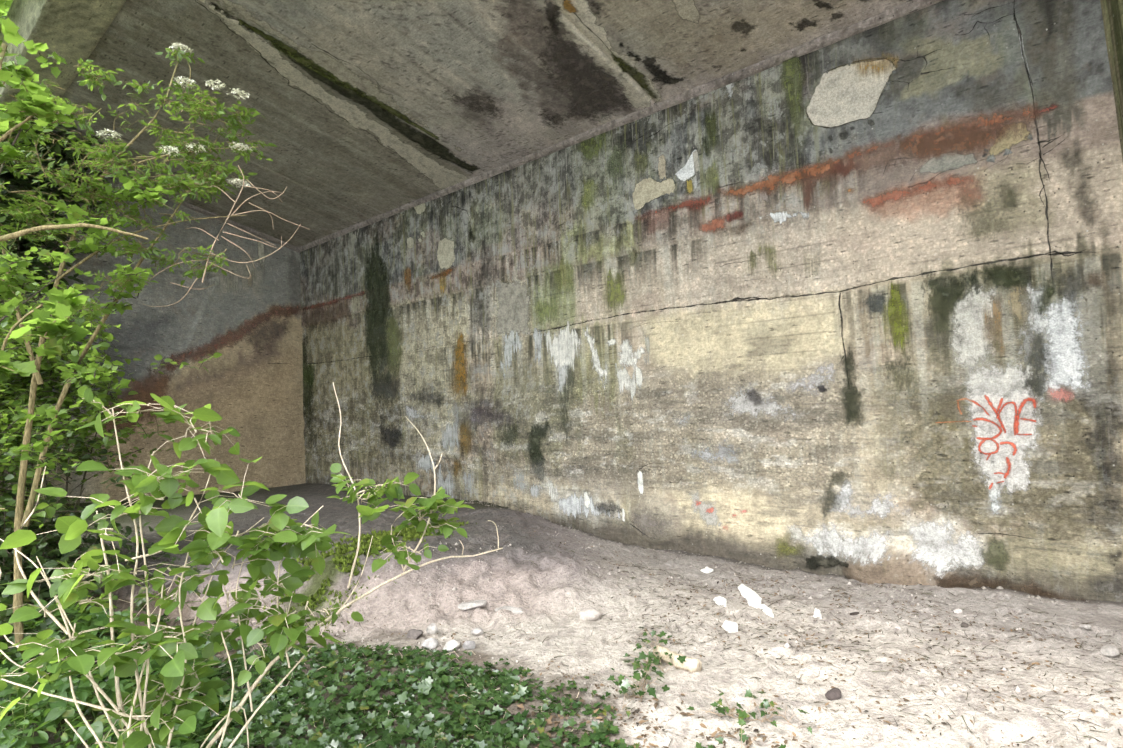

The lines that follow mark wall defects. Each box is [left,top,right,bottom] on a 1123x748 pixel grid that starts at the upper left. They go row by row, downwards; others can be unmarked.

peeling [195,0,469,190]
leakage [541,2,631,128]
leakage [619,42,684,85]
flaking render [629,154,676,215]
corrosion [699,211,747,234]
crack [416,0,1096,381]
corrosion [635,104,1058,222]
flaking render [806,58,898,156]
leakage [500,261,649,400]
leakage [928,262,1085,512]
leakage [790,526,890,570]
leakage [829,480,894,518]